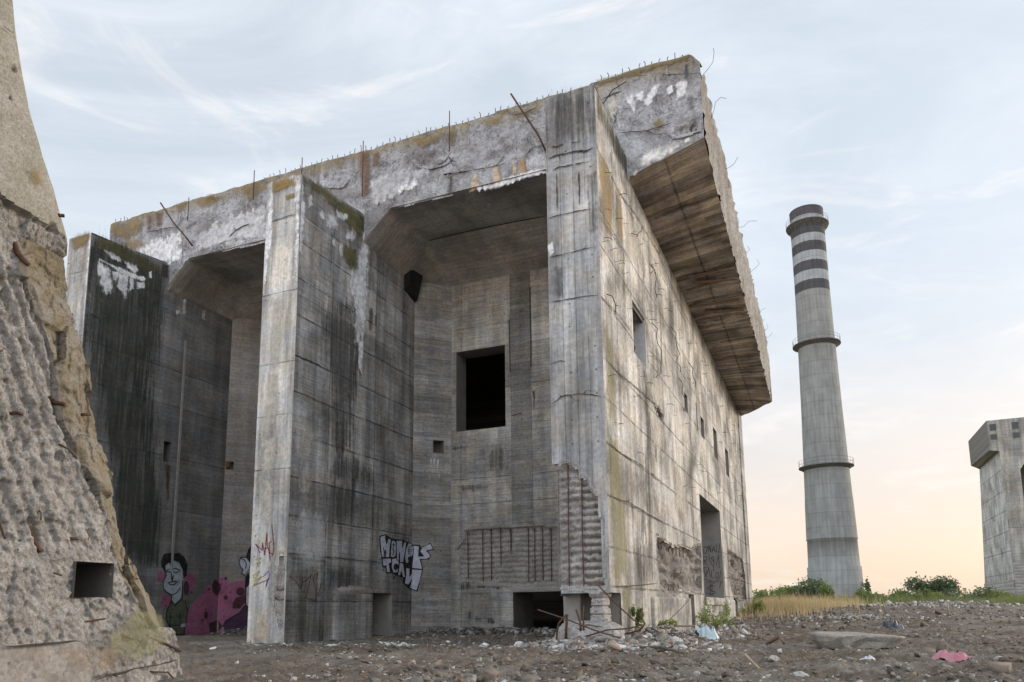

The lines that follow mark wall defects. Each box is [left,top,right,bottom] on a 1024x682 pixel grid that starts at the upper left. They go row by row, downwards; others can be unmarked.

corrosion [360,152,378,194]
crack [439,140,698,338]
water stain [555,64,687,173]
spalling [0,194,183,682]
water stain [83,231,186,567]
water stain [291,175,372,520]
spalling [453,460,653,641]
spalling [656,533,702,597]
spalling [727,548,747,606]